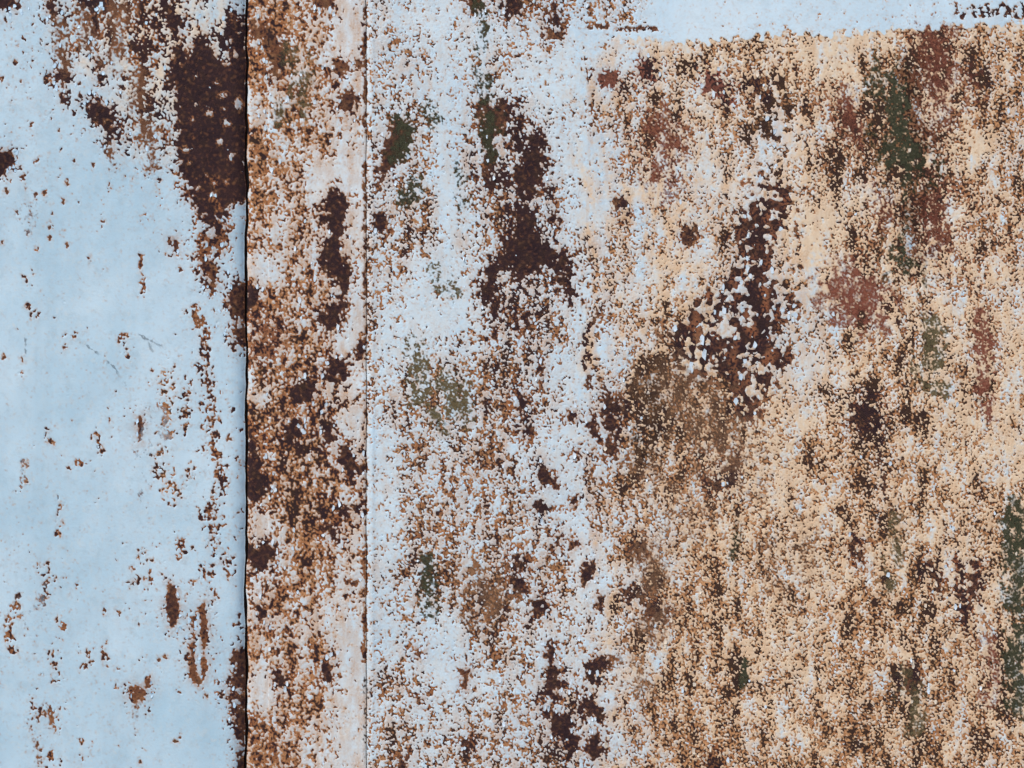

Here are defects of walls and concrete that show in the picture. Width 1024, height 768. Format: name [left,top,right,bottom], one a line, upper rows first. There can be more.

corrosion [359,4,368,135]
peeling [367,0,415,40]
corrosion [586,53,667,93]
corrosion [695,60,739,111]
corrosion [228,301,301,393]
corrosion [360,157,432,343]
corrosion [810,255,891,343]
corrosion [972,308,999,424]
spalling [149,364,183,507]
corrosion [103,287,245,715]
corrosion [359,534,368,663]
corrosion [247,700,311,768]